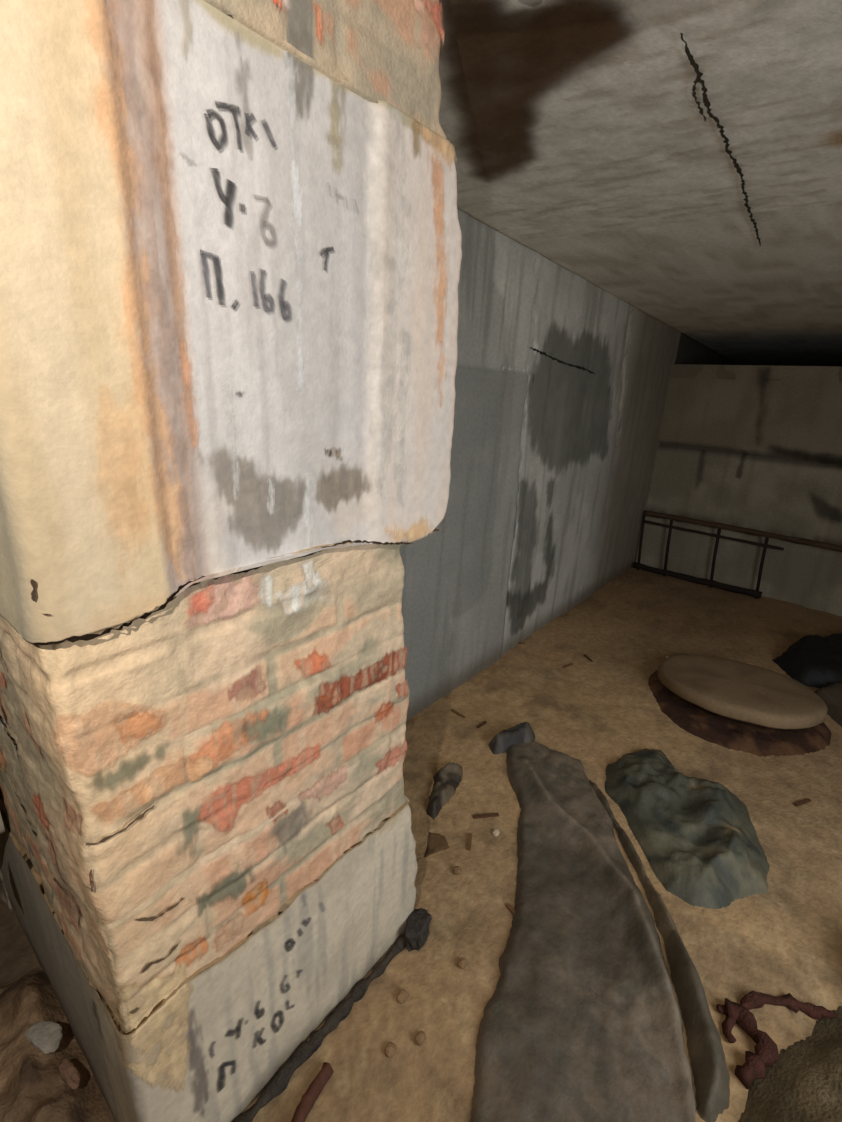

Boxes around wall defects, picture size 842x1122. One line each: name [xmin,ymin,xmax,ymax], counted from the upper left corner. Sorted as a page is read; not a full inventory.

water stain [237,62,251,157]
water stain [328,84,341,148]
crack [680,33,761,247]
water stain [214,110,419,549]
water stain [502,256,633,505]
crack [30,540,413,645]
water stain [259,561,326,615]
water stain [507,531,554,632]